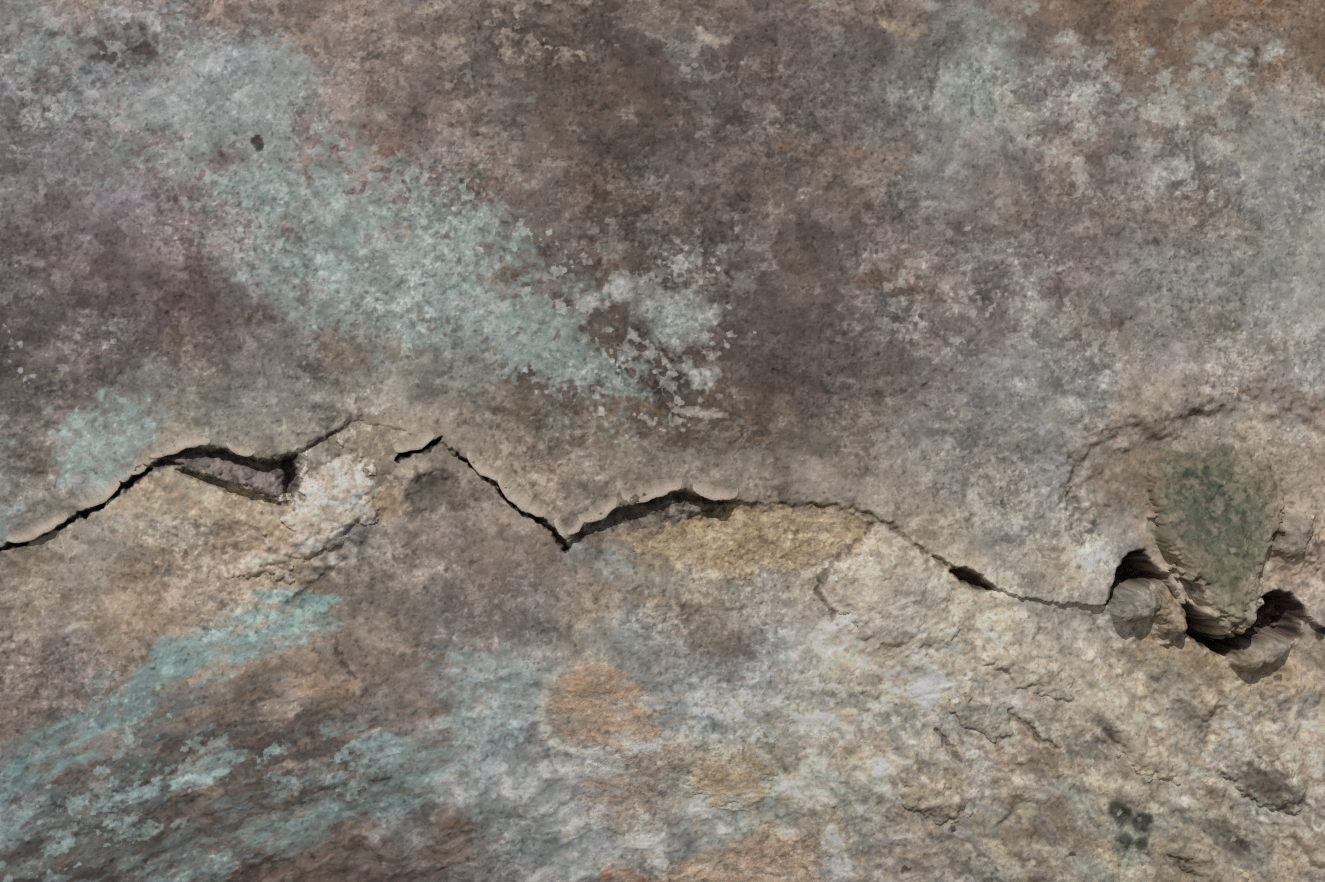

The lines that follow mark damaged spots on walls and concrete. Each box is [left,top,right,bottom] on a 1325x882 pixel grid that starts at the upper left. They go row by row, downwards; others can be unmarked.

crack [0,435,255,551]
crack [291,414,364,463]
crack [392,429,739,554]
crack [1063,389,1252,522]
crack [284,554,349,606]
crack [805,501,955,627]
crack [333,632,358,681]